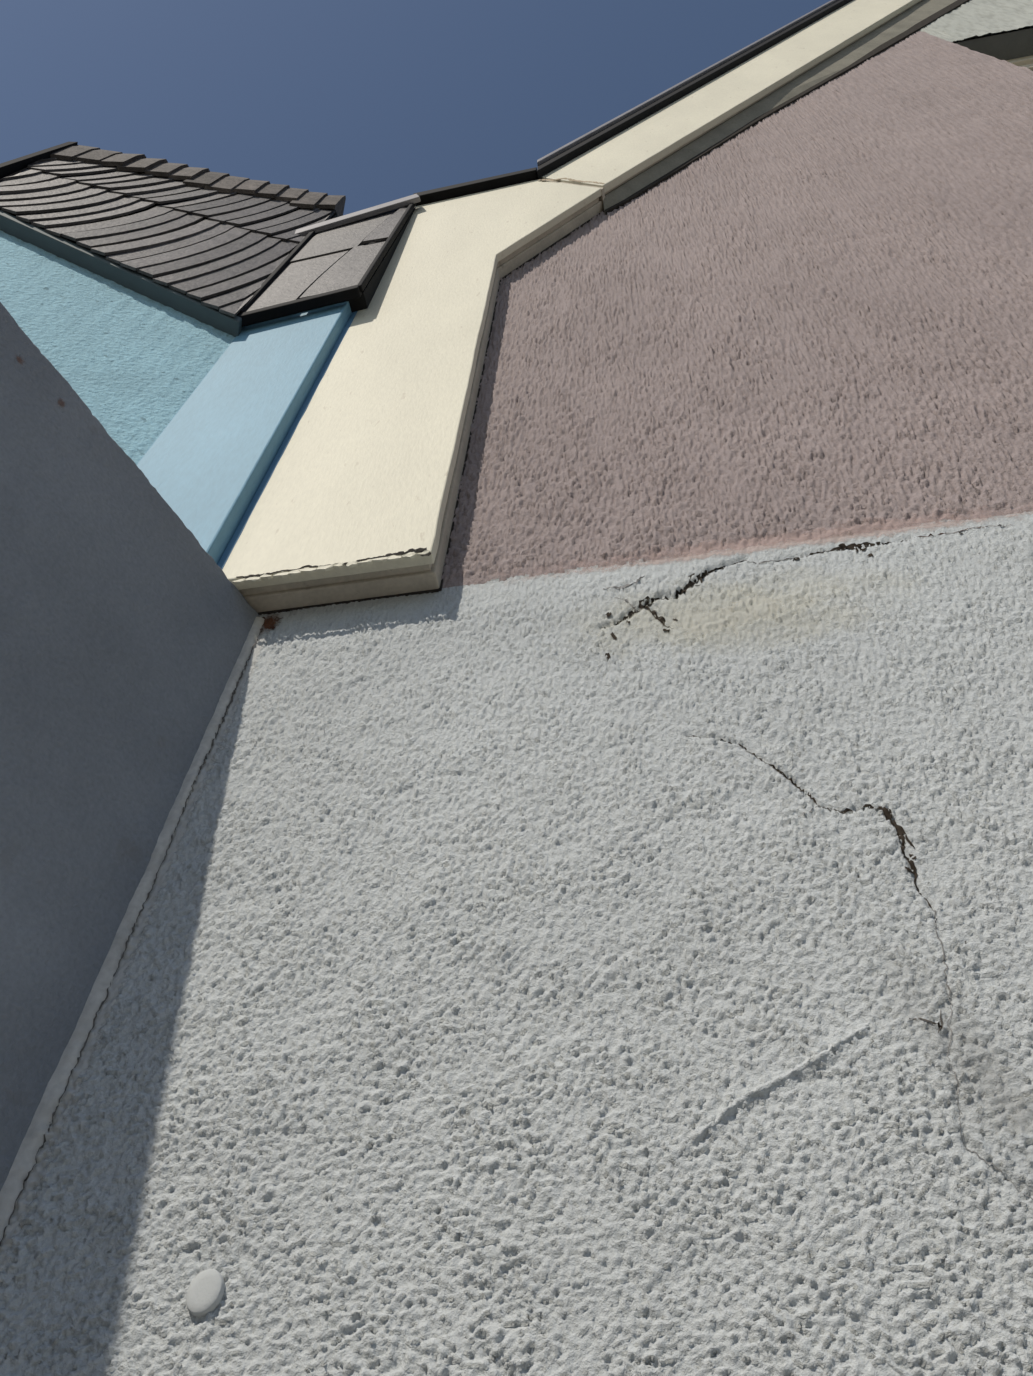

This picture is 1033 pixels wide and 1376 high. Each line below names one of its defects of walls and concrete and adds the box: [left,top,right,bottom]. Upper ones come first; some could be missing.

crack [602,524,1012,659]
crack [686,735,1033,1200]